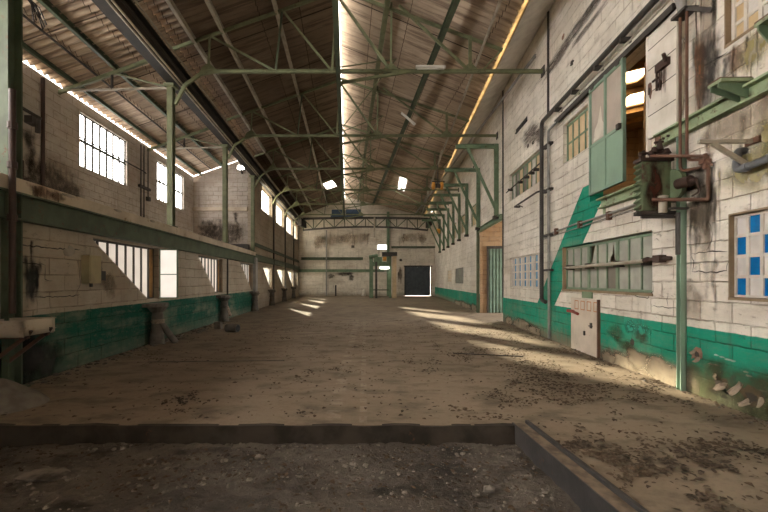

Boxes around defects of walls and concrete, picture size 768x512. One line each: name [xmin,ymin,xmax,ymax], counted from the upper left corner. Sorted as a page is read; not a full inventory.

leakage [693,38,728,106]
rust [646,163,663,207]
crack [23,245,80,298]
crack [691,216,728,273]
peeling [601,329,676,387]
spalling [689,347,767,408]